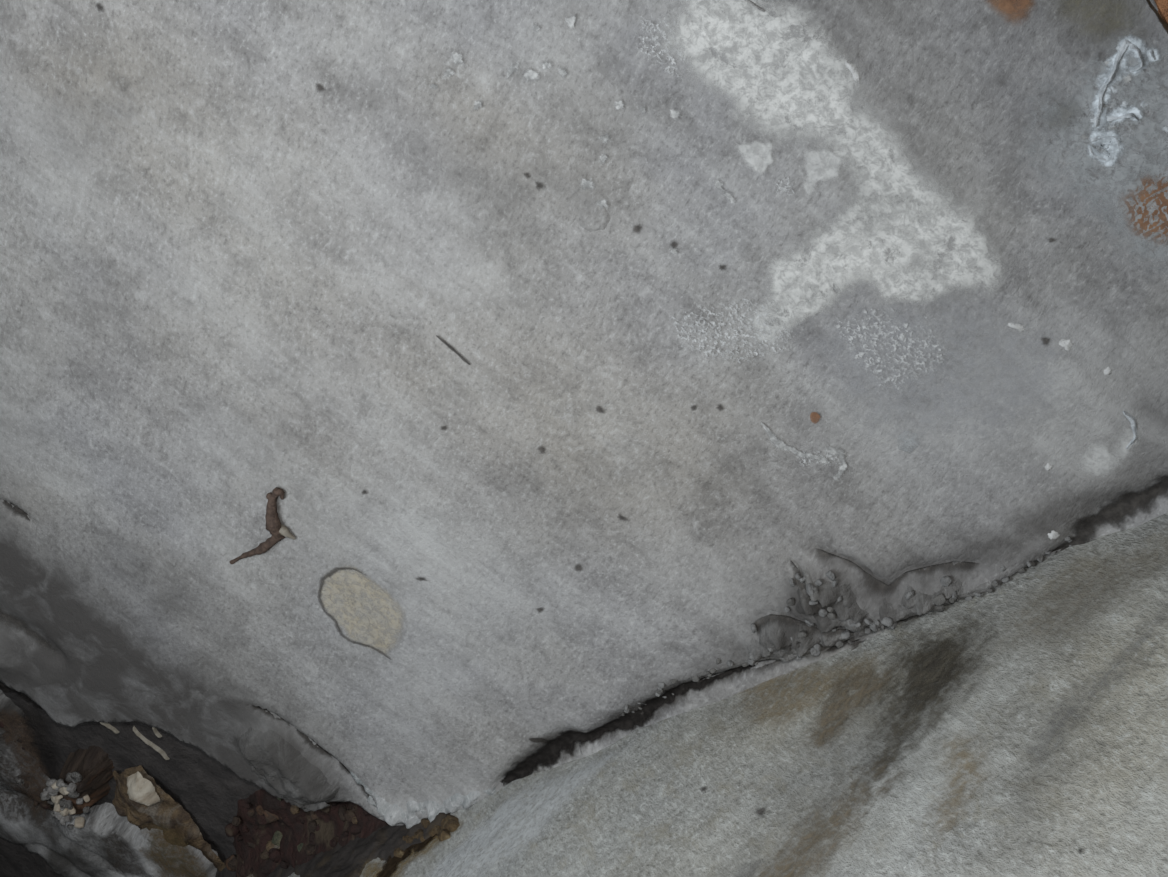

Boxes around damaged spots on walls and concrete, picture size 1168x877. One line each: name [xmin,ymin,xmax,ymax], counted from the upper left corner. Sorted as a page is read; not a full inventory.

rust [989,0,1032,20]
rust [1146,0,1168,34]
leakage [1042,36,1168,258]
rust [1127,178,1168,238]
crack [948,476,1168,603]
peeling [318,568,402,659]
crack [826,636,861,652]
spalling [0,691,450,877]
crack [501,658,779,784]
leakage [738,621,985,877]
crack [376,834,437,877]
rust [394,815,460,858]